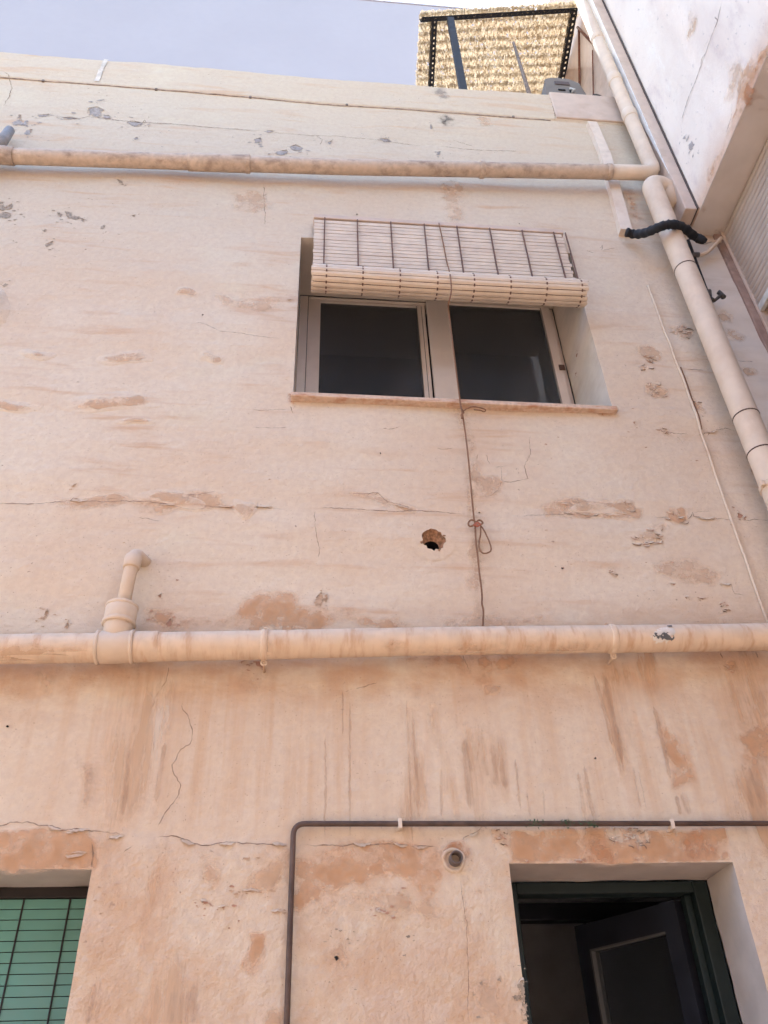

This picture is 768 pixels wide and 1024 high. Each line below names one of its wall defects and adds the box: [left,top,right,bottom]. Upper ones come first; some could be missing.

peeling [11,99,150,141]
crack [6,493,272,520]
crack [159,708,287,846]
leakage [742,778,768,846]
crack [322,841,431,849]